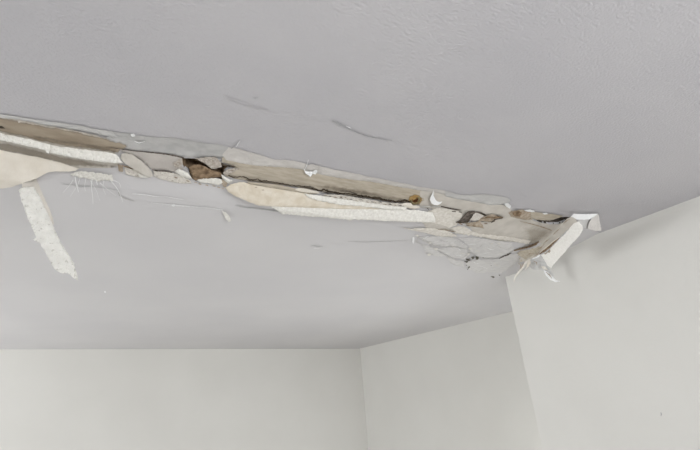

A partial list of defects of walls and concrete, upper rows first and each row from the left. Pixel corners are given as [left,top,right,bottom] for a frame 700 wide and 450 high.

spalling [0,114,570,273]
crack [378,234,539,261]